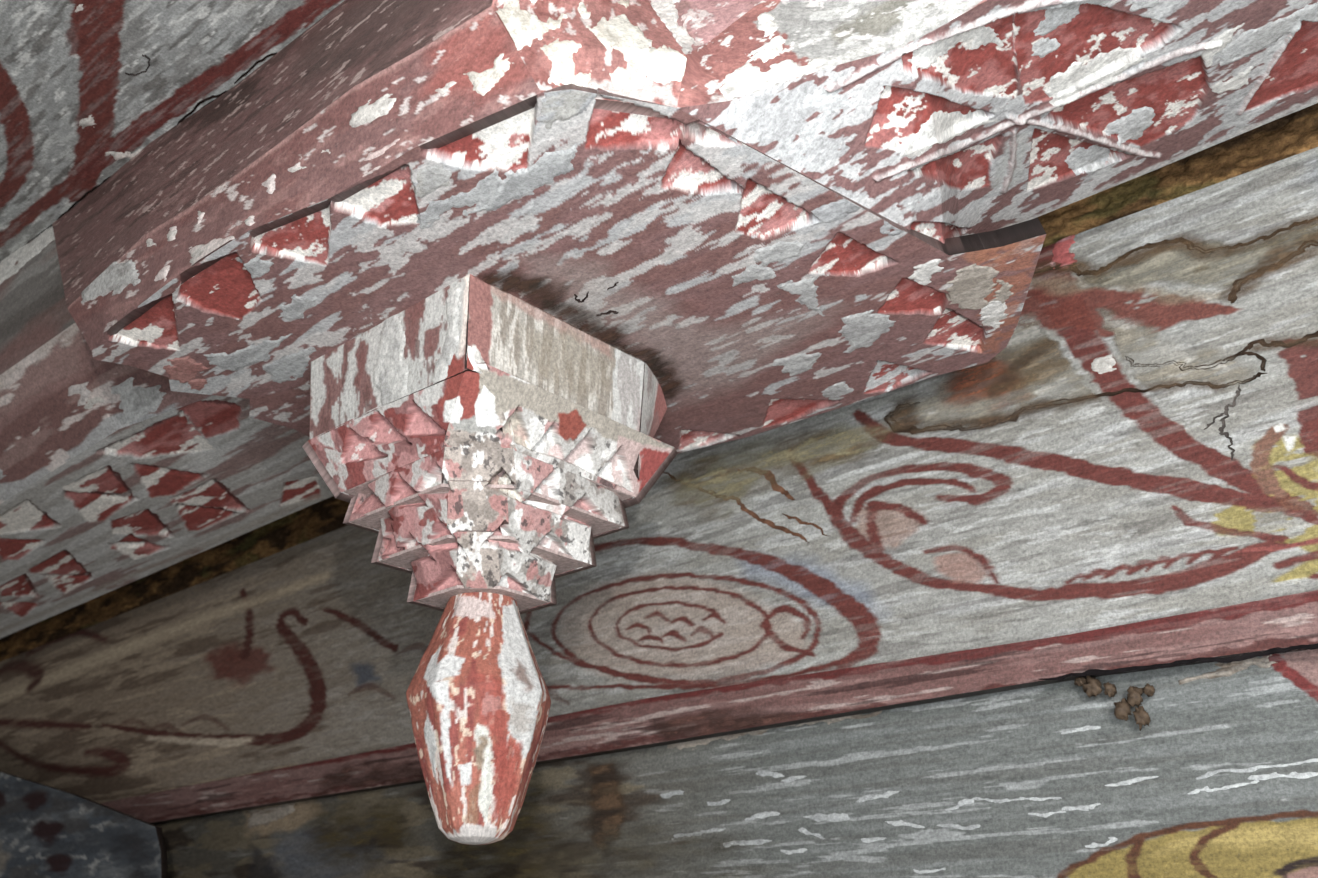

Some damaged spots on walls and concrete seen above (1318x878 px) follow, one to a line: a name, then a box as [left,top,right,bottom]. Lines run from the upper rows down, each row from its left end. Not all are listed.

peeling [349,94,396,128]
peeling [435,0,695,129]
peeling [719,4,825,100]
peeling [900,109,997,158]
peeling [1031,0,1112,58]
peeling [1045,47,1148,107]
peeling [1065,106,1155,176]
peeling [1201,2,1318,94]
peeling [414,143,577,229]
peeling [908,259,1014,333]
water stain [1034,217,1318,297]
crack [884,331,1318,460]